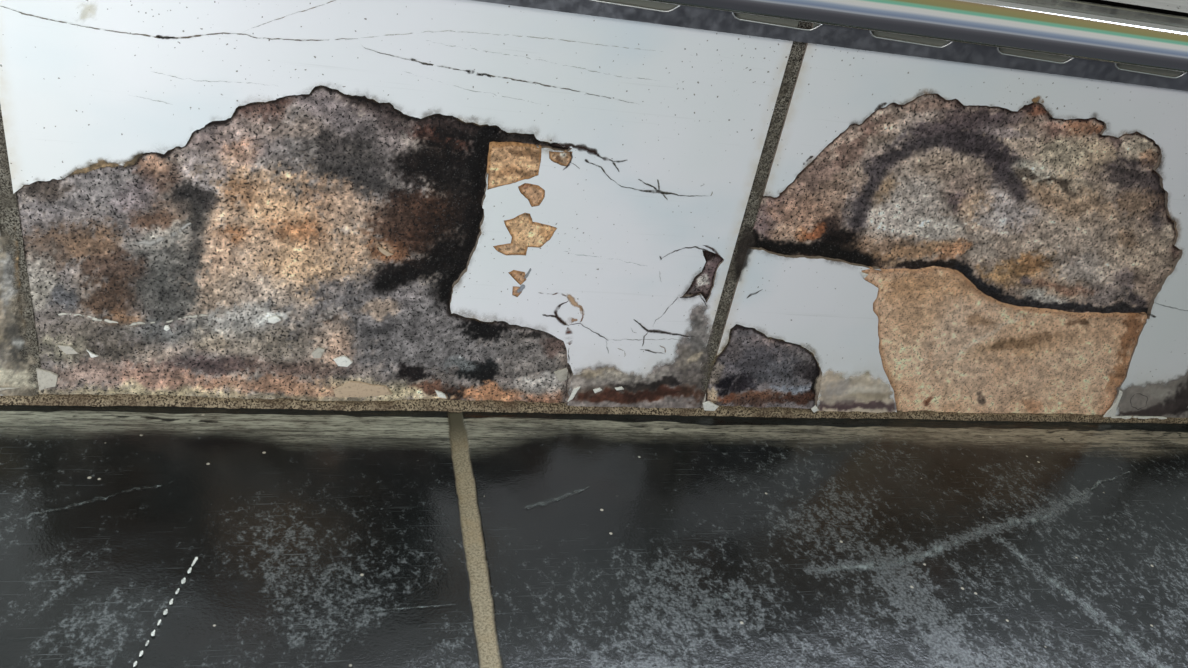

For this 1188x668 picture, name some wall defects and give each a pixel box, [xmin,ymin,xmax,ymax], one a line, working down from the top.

crack [1,1,644,103]
spalling [13,85,626,403]
crack [563,152,713,199]
spalling [752,91,1180,318]
crack [542,293,695,357]
spalling [703,324,820,412]